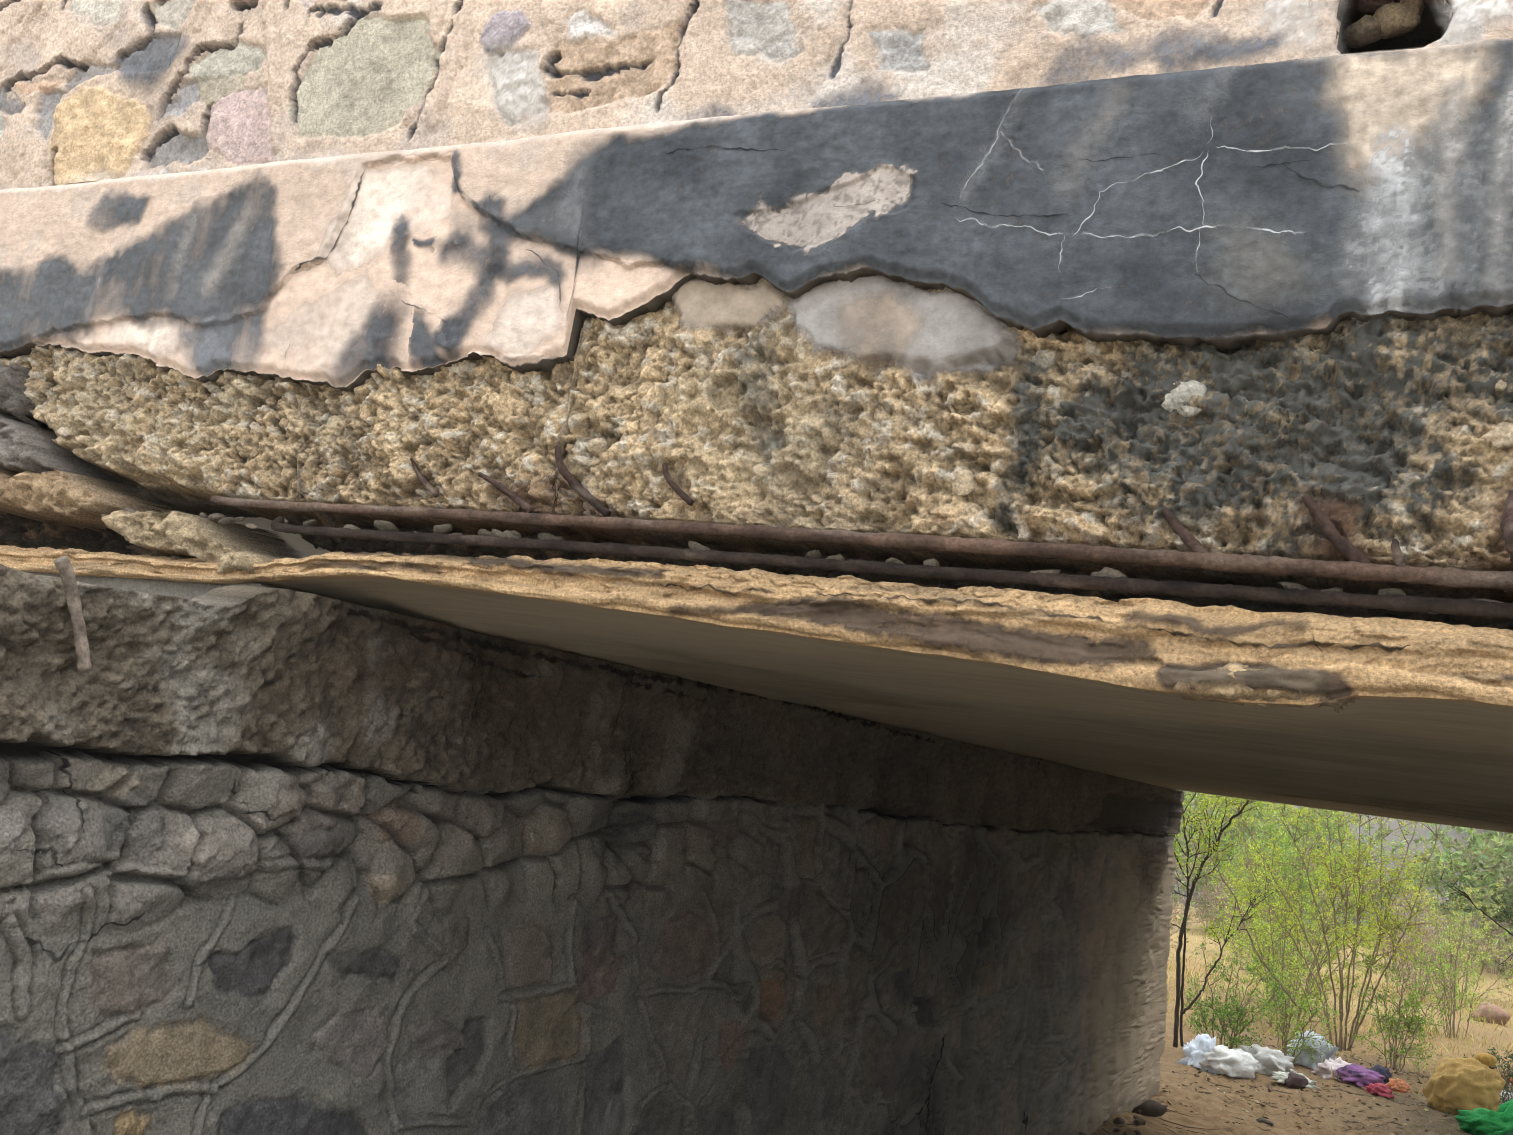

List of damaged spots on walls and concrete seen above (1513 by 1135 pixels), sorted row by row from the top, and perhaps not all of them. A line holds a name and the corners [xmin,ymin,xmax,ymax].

crack [665,146,787,154]
crack [295,170,365,271]
crack [451,155,561,302]
crack [942,90,1360,318]
spalling [0,152,1513,631]
rust [309,551,666,578]
crack [16,750,85,867]
crack [231,778,276,821]
crack [385,774,498,805]